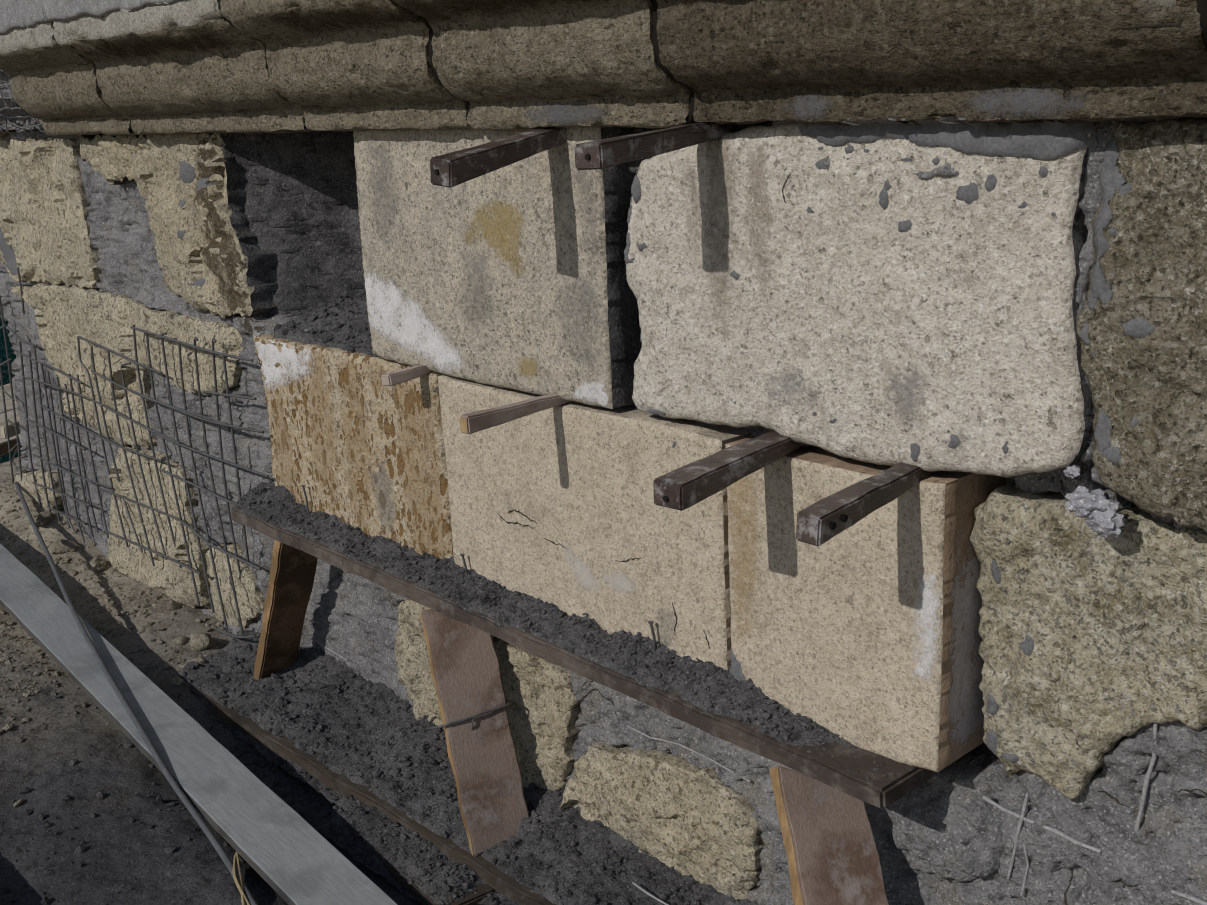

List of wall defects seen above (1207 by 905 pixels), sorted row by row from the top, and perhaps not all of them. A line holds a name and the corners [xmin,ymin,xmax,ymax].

crack [0,0,181,35]
crack [384,0,442,85]
crack [650,0,711,123]
crack [1111,0,1207,51]
peeling [178,161,219,191]
damp [194,137,314,388]
damp [364,273,461,371]
crack [498,507,567,549]